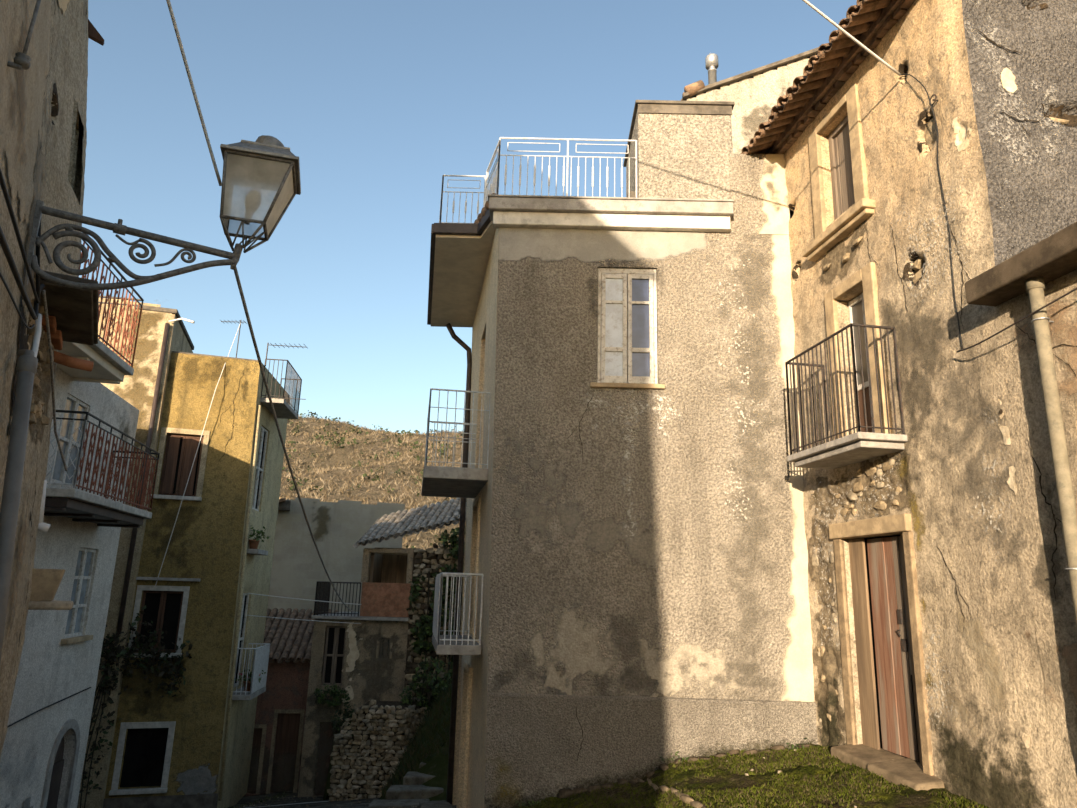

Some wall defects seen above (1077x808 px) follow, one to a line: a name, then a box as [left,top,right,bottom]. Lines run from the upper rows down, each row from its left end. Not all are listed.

hole [917,110,937,153]
peeling [964,16,1077,165]
crack [866,222,911,322]
hole [902,248,925,286]
crack [1014,321,1077,378]
crack [1027,440,1061,600]
flaking render [807,451,914,748]
crack [936,542,973,631]